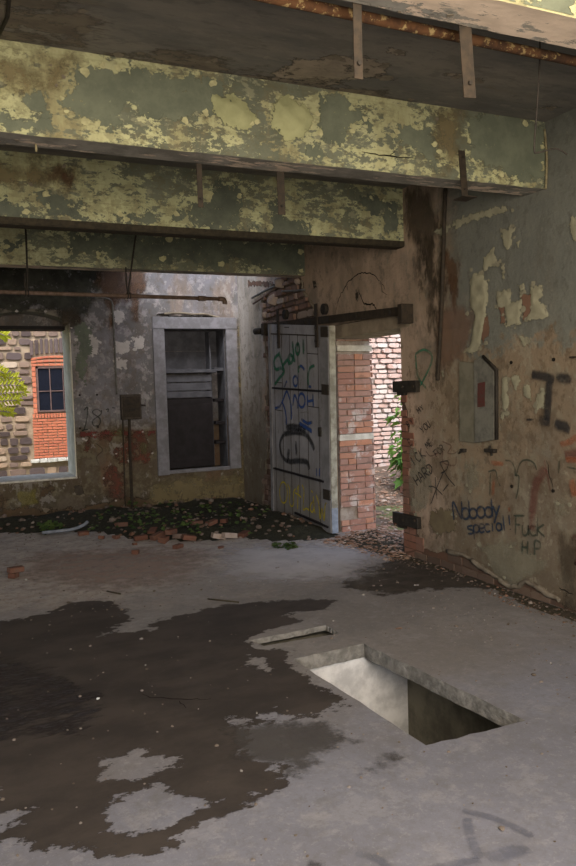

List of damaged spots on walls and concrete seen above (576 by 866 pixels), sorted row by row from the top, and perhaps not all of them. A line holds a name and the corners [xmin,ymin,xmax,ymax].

spalling [0,0,108,48]
peeling [359,0,459,18]
peeling [510,0,576,15]
peeling [0,49,396,164]
peeling [392,121,442,175]
peeling [0,190,89,221]
peeling [171,178,317,235]
peeling [357,193,402,241]
peeling [434,205,514,237]
water stain [406,189,441,329]
peeling [441,224,550,377]
water stain [0,598,351,859]